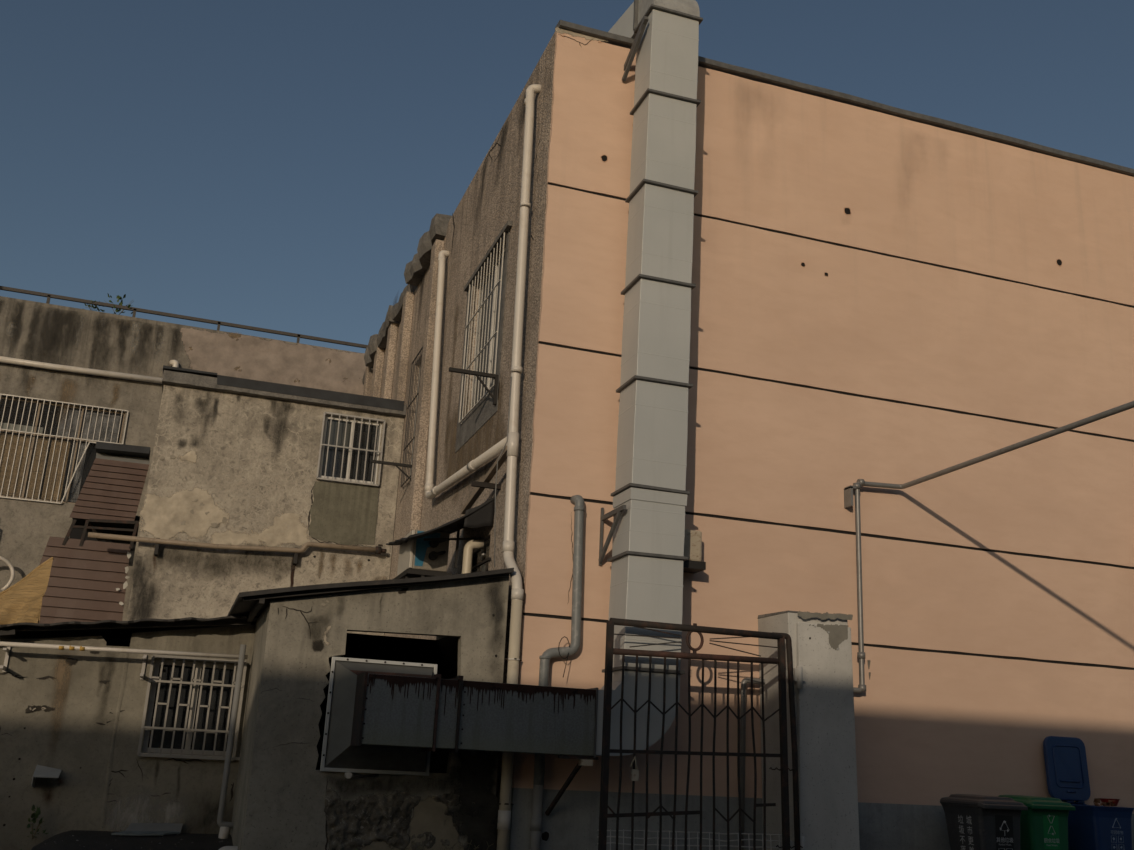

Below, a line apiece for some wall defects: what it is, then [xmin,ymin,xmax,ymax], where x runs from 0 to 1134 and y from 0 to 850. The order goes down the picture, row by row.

damp [9,306,83,361]
damp [92,320,178,365]
crack [278,606,312,637]
peeling [797,611,853,650]
rust [350,670,596,716]
spalling [324,788,461,850]